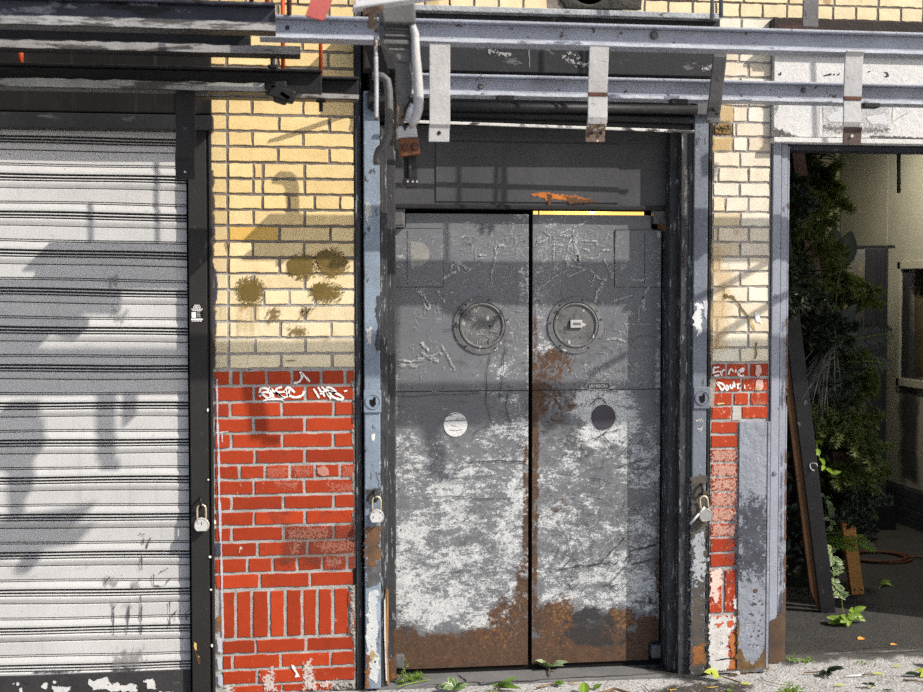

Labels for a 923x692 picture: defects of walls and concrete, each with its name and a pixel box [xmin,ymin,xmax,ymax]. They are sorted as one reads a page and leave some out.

rust [531,192,595,205]
damp [264,303,317,340]
peeling [710,568,724,603]
rust [728,449,787,675]
peeling [292,560,387,691]
peeling [708,598,737,671]